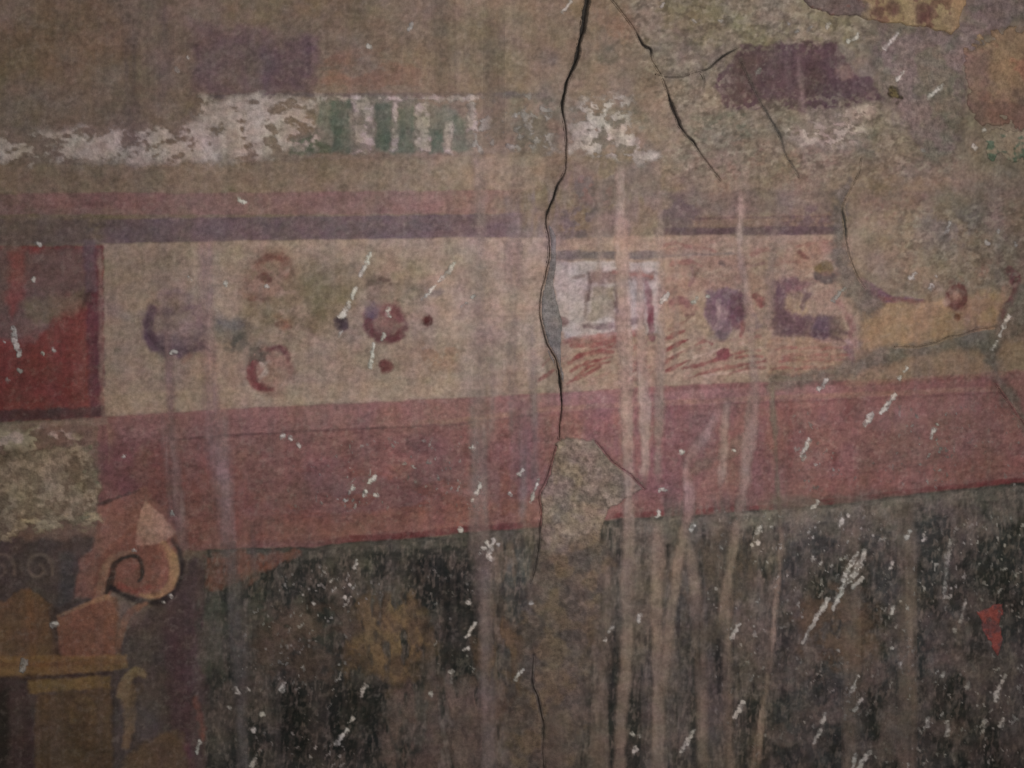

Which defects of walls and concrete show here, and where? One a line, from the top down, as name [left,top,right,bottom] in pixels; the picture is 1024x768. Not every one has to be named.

peeling [0,93,660,168]
crack [530,0,801,584]
leakage [737,197,748,303]
peeling [0,425,102,540]
leakage [614,169,665,768]
leakage [650,405,728,768]
leakage [719,521,738,665]
leakage [770,575,780,657]
crack [530,655,546,768]
leakage [751,675,768,768]